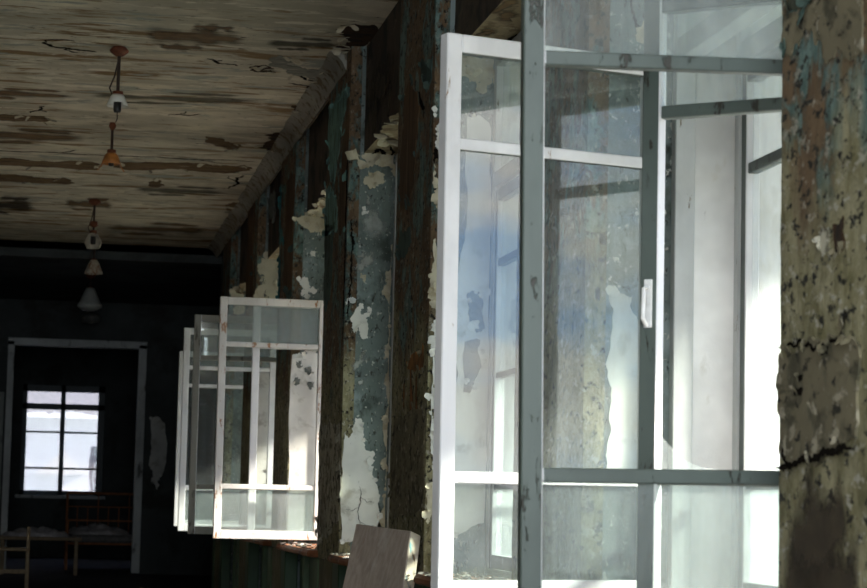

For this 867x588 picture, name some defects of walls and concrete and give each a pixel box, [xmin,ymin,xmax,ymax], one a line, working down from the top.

flaking render [462,55,495,94]
peeling [205,136,242,152]
peeling [431,106,439,152]
peeling [0,158,100,185]
peeling [113,162,252,188]
peeling [229,55,433,315]
peeling [455,152,492,472]
crack [777,309,846,352]
peeling [280,226,437,559]
peeling [255,366,270,502]
crack [775,443,854,472]
peeling [453,483,486,538]